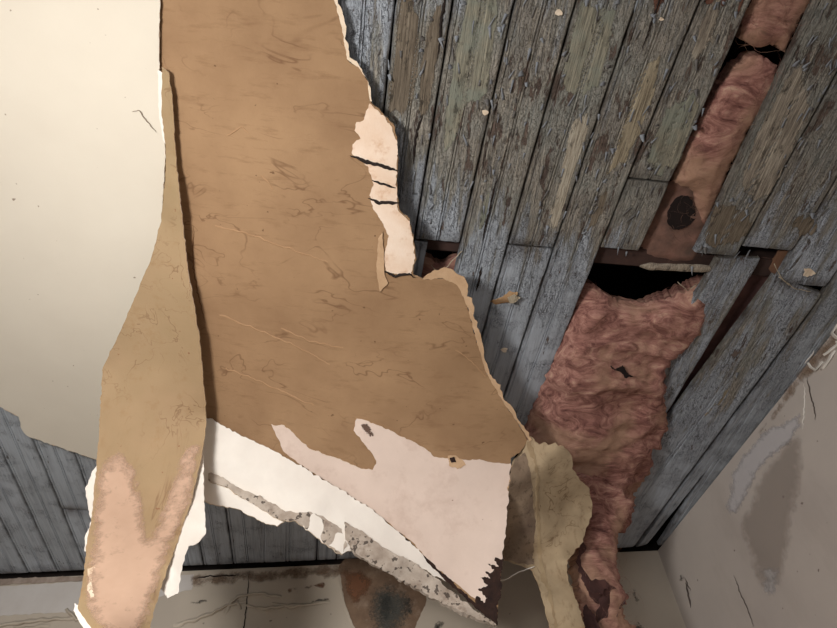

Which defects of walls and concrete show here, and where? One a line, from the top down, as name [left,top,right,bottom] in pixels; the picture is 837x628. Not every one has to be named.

spalling [352,0,426,291]
peeling [437,0,528,151]
peeling [538,0,705,246]
peeling [740,33,837,222]
peeling [791,205,829,248]
peeling [208,473,497,628]